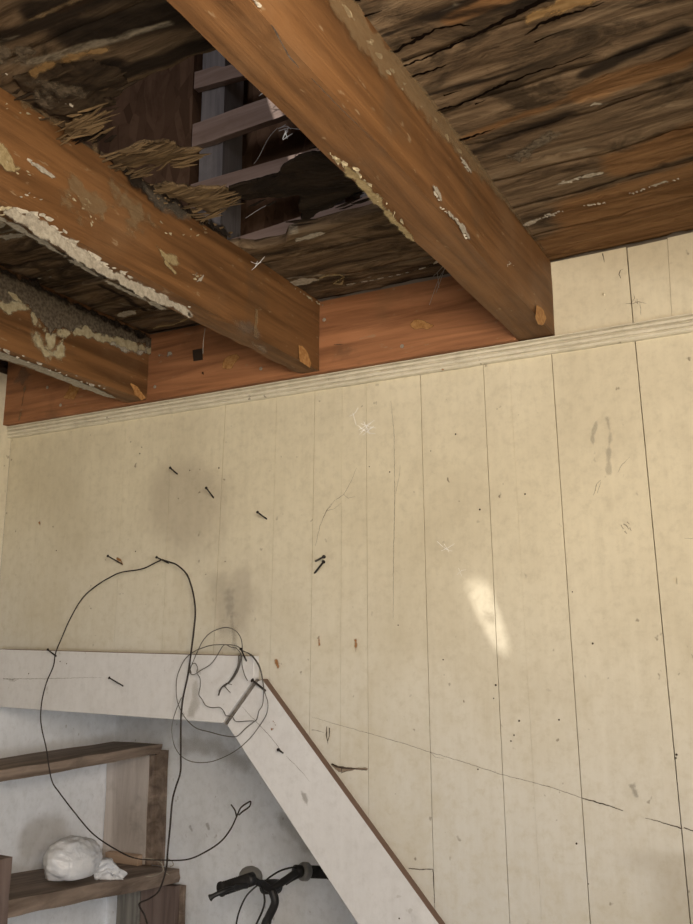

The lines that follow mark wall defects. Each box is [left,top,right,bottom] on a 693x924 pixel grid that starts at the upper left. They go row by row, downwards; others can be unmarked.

crack [389,0,604,78]
water stain [27,81,86,109]
spalling [19,99,119,150]
peeling [331,0,563,239]
crack [459,128,495,141]
crack [438,53,592,111]
spalling [153,180,244,237]
peeling [0,193,193,318]
crack [313,717,623,811]